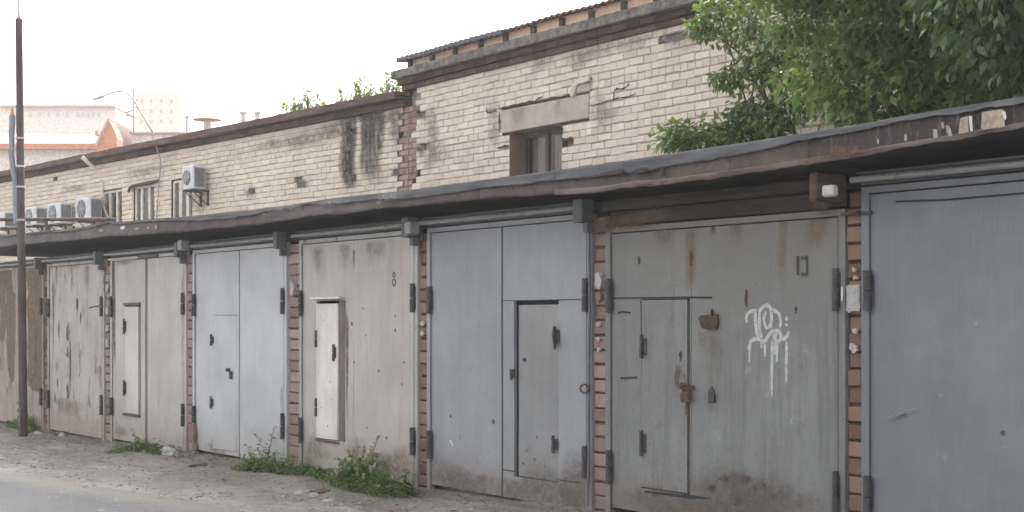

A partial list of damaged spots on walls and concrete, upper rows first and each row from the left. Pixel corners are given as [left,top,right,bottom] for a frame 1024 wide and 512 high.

water stain [340,109,400,184]
crack [592,84,635,107]
peeling [933,109,1006,138]
peeling [0,267,109,401]
rust [675,348,689,437]